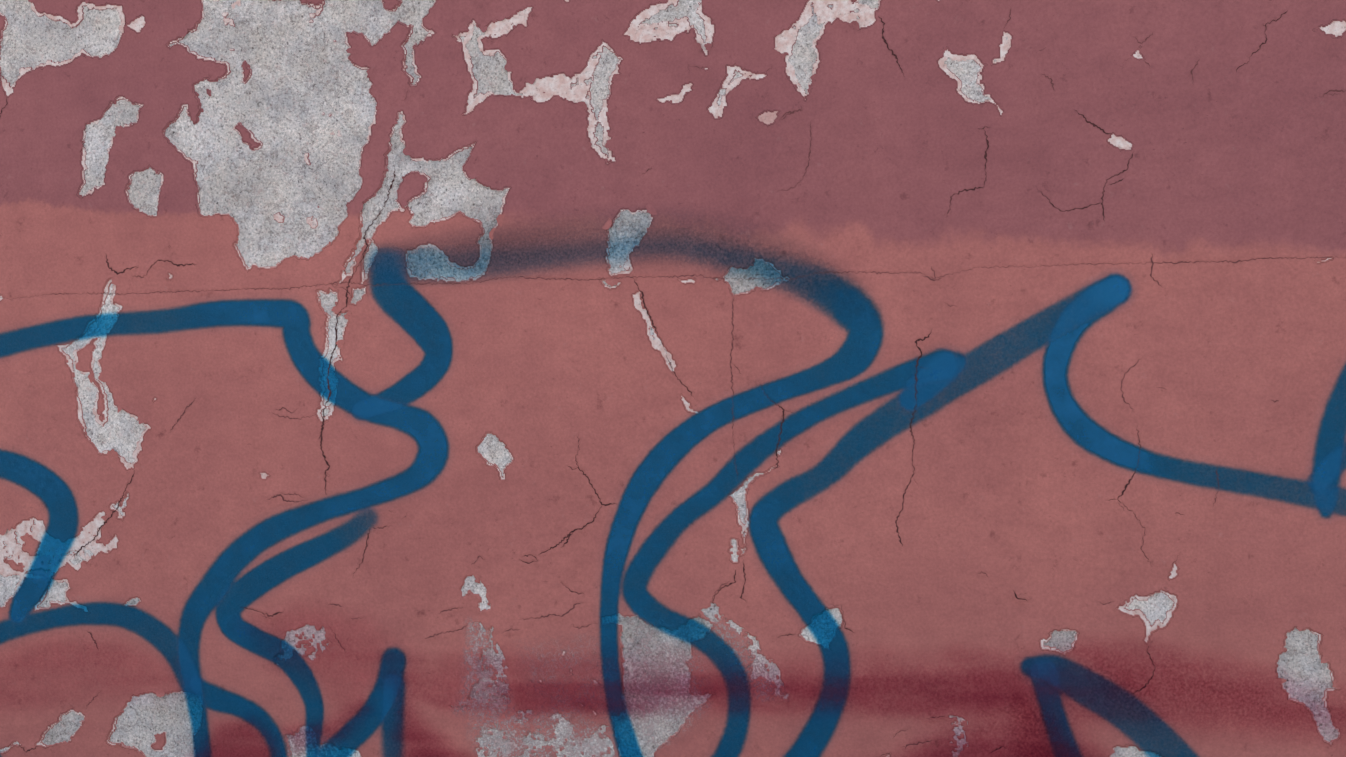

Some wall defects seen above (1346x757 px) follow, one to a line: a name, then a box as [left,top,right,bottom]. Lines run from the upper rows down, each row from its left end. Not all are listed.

peeling [0,0,147,98]
peeling [76,95,146,199]
peeling [161,0,716,424]
peeling [773,0,882,102]
crack [1037,50,1133,221]
peeling [0,490,130,614]
peeling [55,276,152,471]
crack [74,474,134,555]
crack [521,434,616,564]
crack [1,171,1341,502]
crack [895,333,931,546]
crack [1108,359,1177,564]